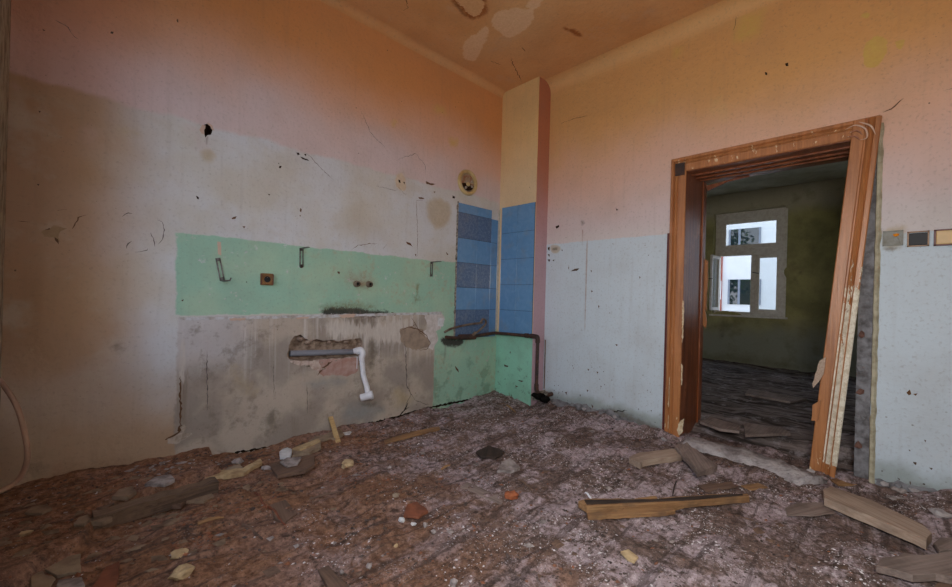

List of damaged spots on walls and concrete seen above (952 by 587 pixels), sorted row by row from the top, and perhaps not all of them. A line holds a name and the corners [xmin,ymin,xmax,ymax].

peeling [458,0,548,64]
flaking render [179,312,445,350]
spalling [287,335,363,376]
crack [368,319,471,423]
crack [165,378,182,440]